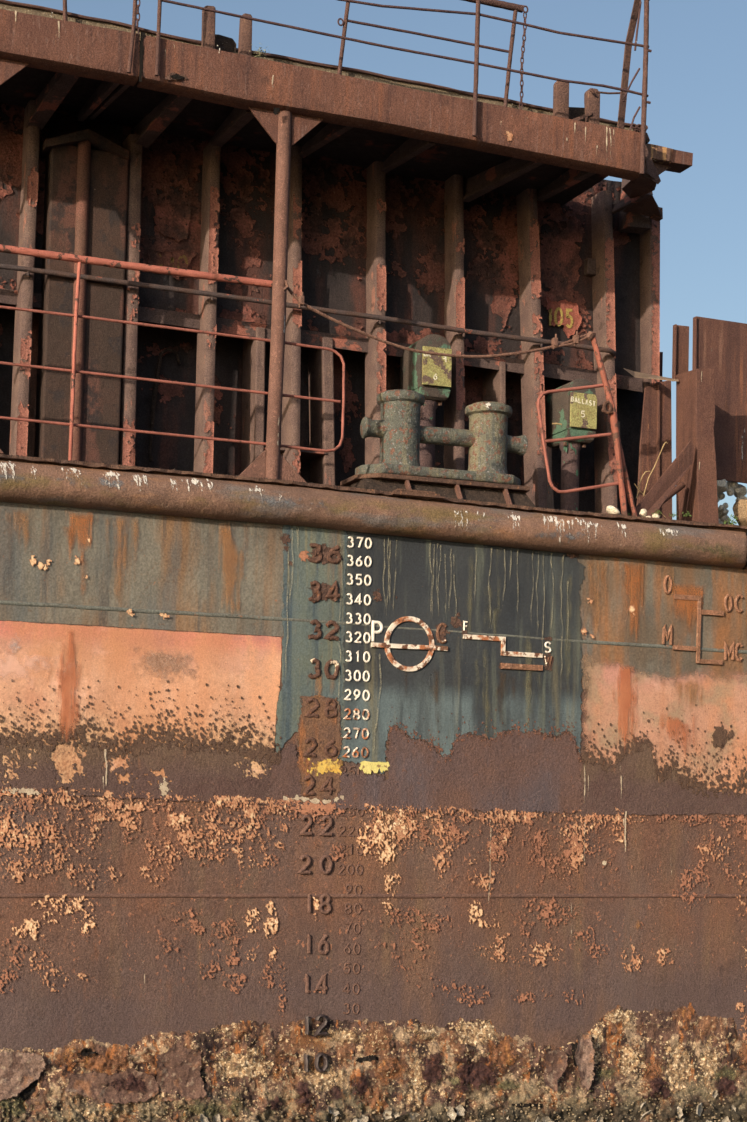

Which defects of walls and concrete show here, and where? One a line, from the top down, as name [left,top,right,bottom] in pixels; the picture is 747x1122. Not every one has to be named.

rust [57,633,77,735]
rust [618,668,636,744]
rust [712,725,734,751]
peeling [0,653,747,1017]
rust [0,1003,747,1122]